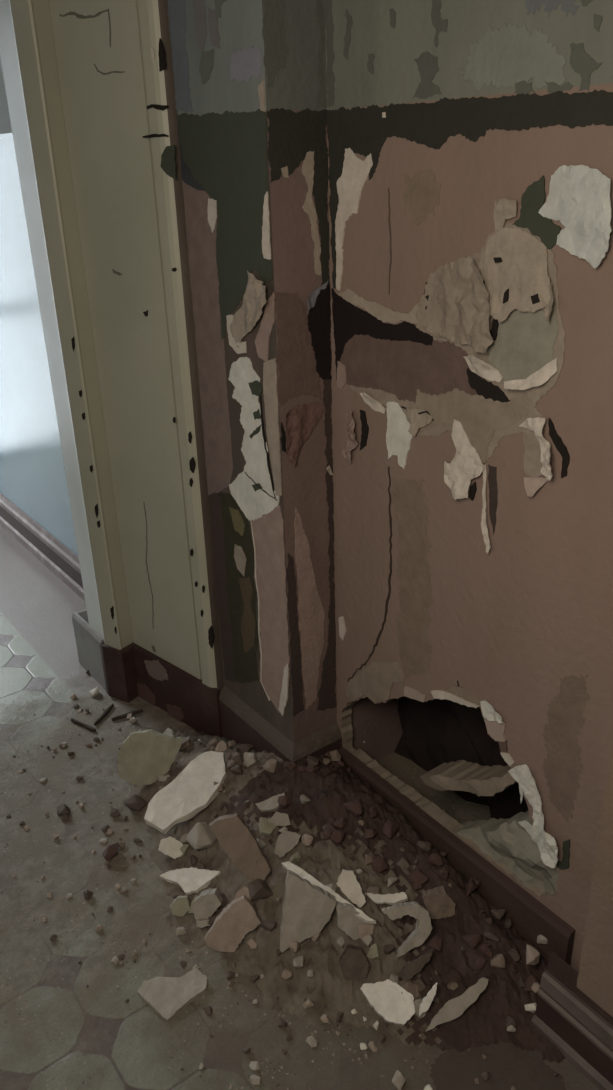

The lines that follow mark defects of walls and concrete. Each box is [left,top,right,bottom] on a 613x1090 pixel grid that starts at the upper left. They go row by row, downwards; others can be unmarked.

crack [59,9,125,75]
flaking render [208,198,217,233]
flaking render [262,191,271,259]
peeling [274,165,612,464]
peeling [200,609,214,648]
flaking render [217,357,279,683]
flaking render [338,616,346,641]
crack [348,467,392,681]
spalling [346,661,514,772]
flaking render [452,782,559,894]